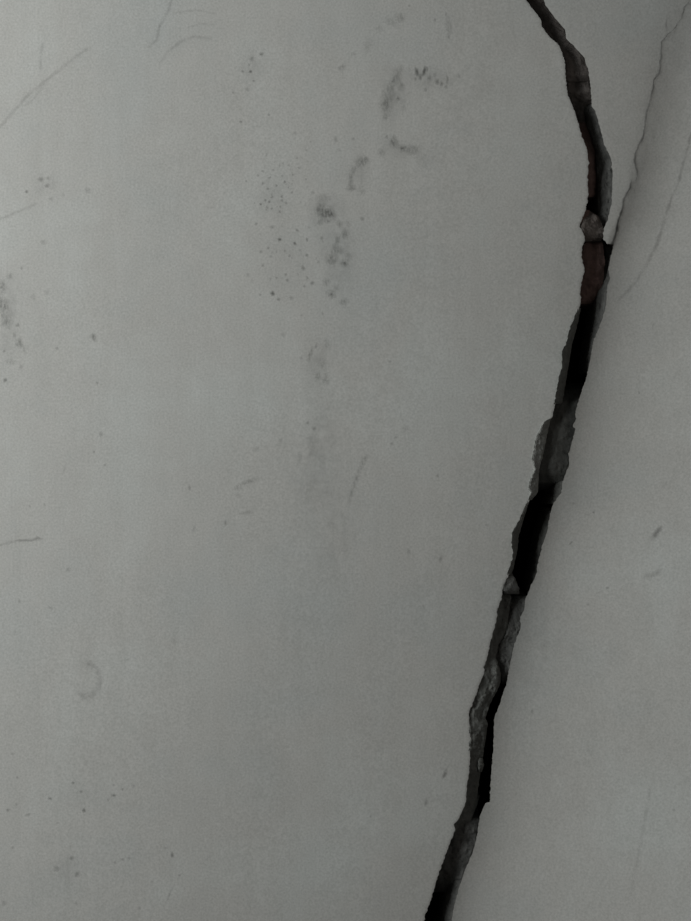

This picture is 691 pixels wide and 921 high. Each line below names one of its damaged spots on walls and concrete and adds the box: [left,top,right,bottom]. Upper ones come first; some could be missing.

crack [424,0,631,921]